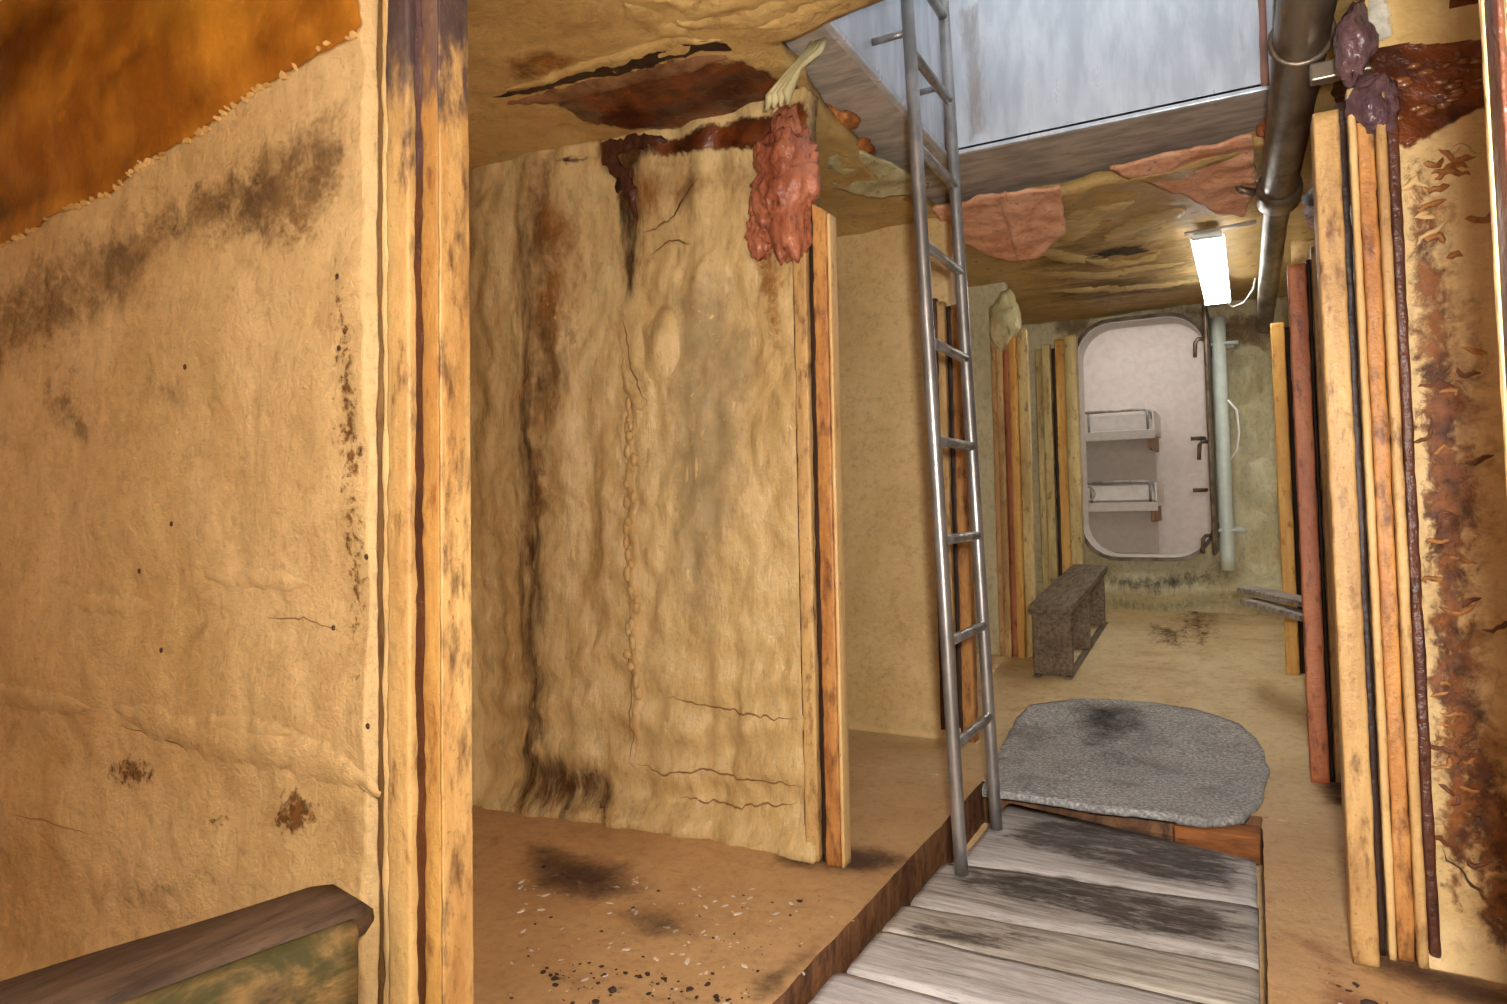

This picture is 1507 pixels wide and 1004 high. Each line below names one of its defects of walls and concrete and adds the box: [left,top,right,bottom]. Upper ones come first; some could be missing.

peeling [0,0,361,248]
peeling [1364,0,1485,148]
leakage [171,139,340,235]
crack [643,179,698,256]
corrosion [1484,0,1507,390]
leakage [0,244,149,354]
crack [622,318,647,405]
corrosion [1376,112,1507,958]
corrosion [107,758,153,789]
corrosion [275,789,319,834]
crack [628,635,800,810]
crack [1442,848,1486,900]